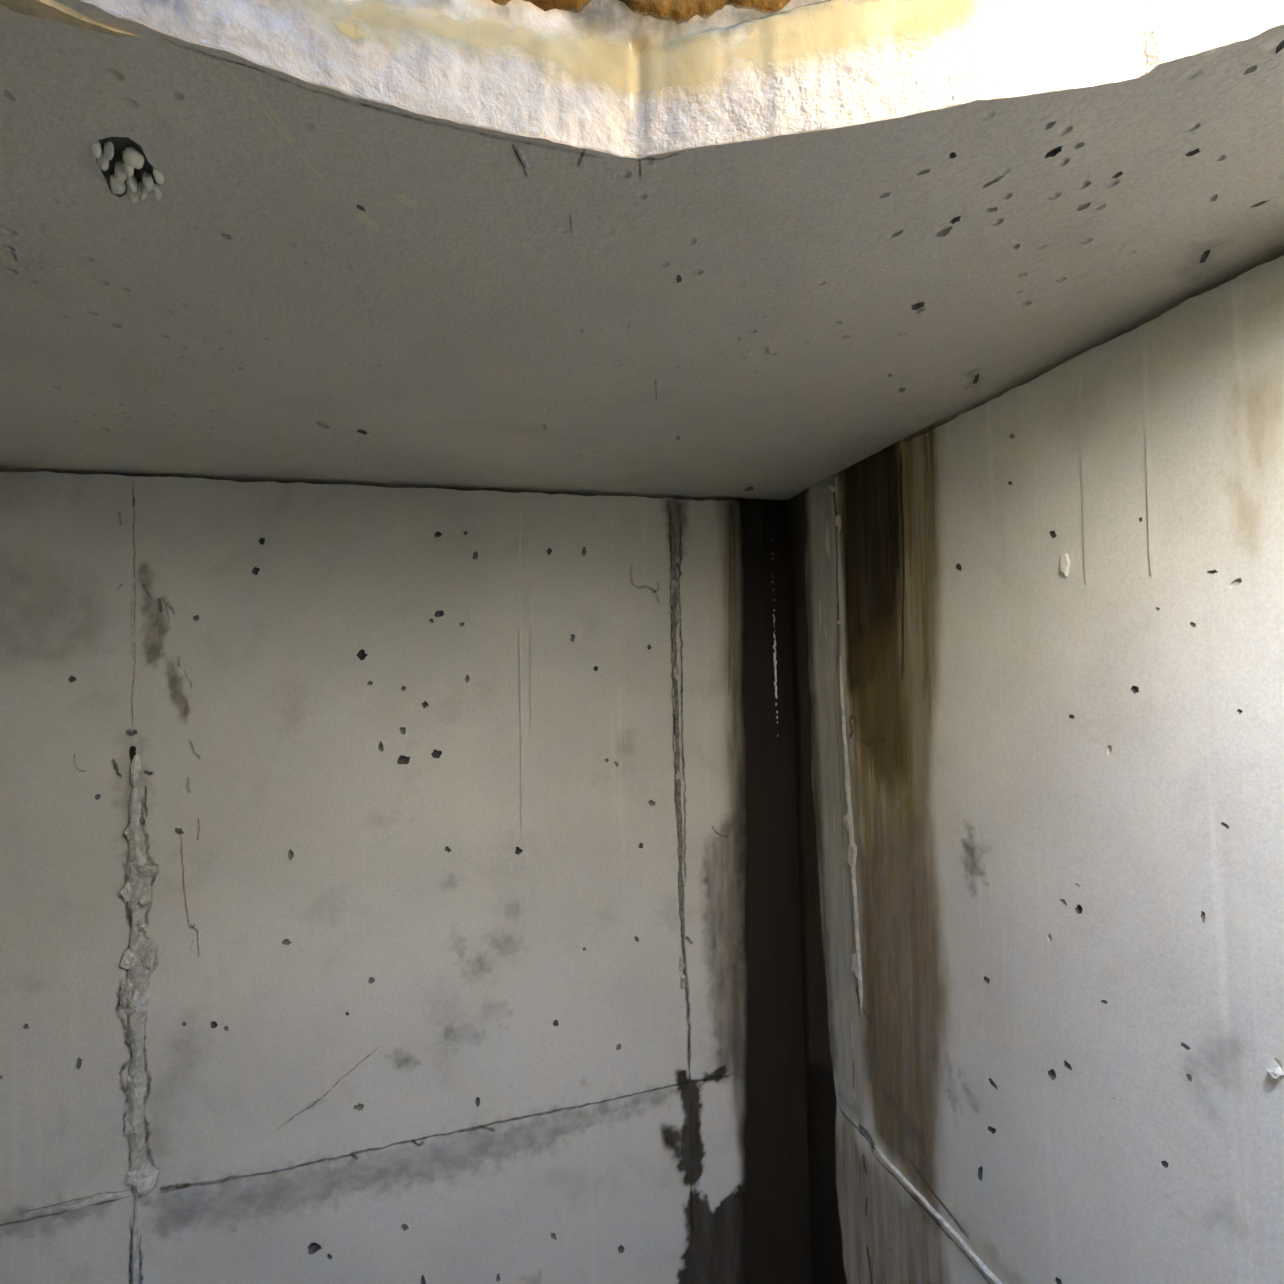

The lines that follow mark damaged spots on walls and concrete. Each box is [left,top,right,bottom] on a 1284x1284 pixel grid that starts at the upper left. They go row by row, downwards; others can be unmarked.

spalling [92,137,164,203]
crack [113,730,200,1160]
crack [161,521,703,1190]
water stain [662,491,847,1284]
crack [0,1191,125,1226]
crack [129,1229,143,1284]
crack [838,1064,991,1284]